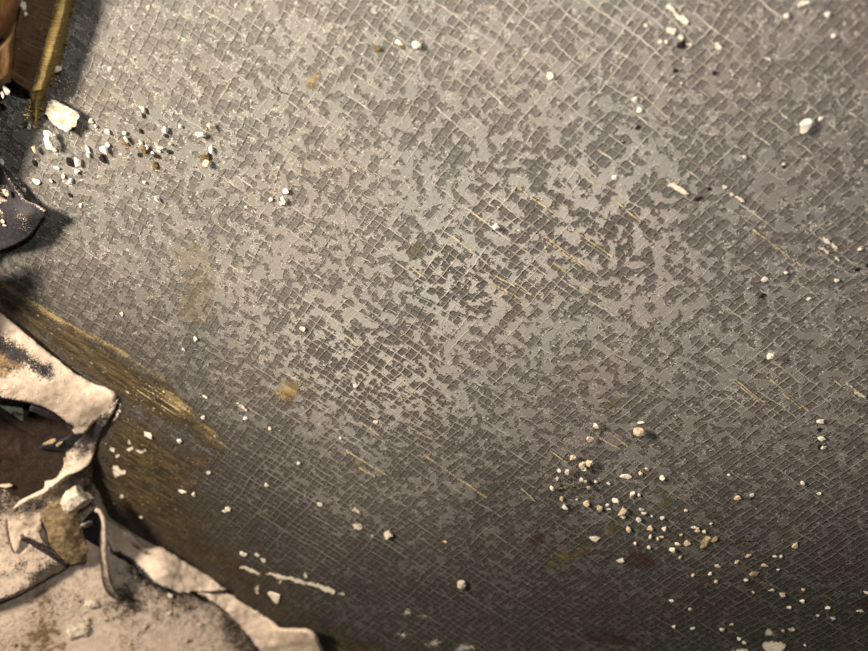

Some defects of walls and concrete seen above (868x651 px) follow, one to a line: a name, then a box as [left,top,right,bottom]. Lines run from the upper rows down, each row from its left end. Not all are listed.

peeling [109,440,146,476]
leakage [0,282,269,598]
peeling [240,566,345,595]